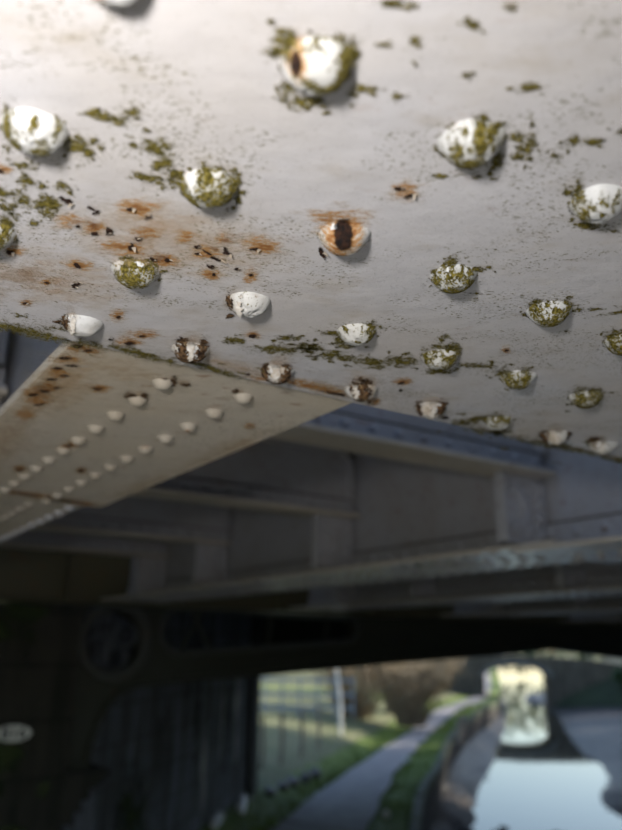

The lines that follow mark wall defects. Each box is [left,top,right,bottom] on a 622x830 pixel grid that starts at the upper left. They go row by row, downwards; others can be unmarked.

corrosion [288,38,307,80]
corrosion [67,260,93,269]
corrosion [59,199,176,266]
corrosion [179,231,231,280]
corrosion [243,237,279,254]
corrosion [312,210,366,260]
corrosion [16,344,100,420]
corrosion [287,378,347,397]